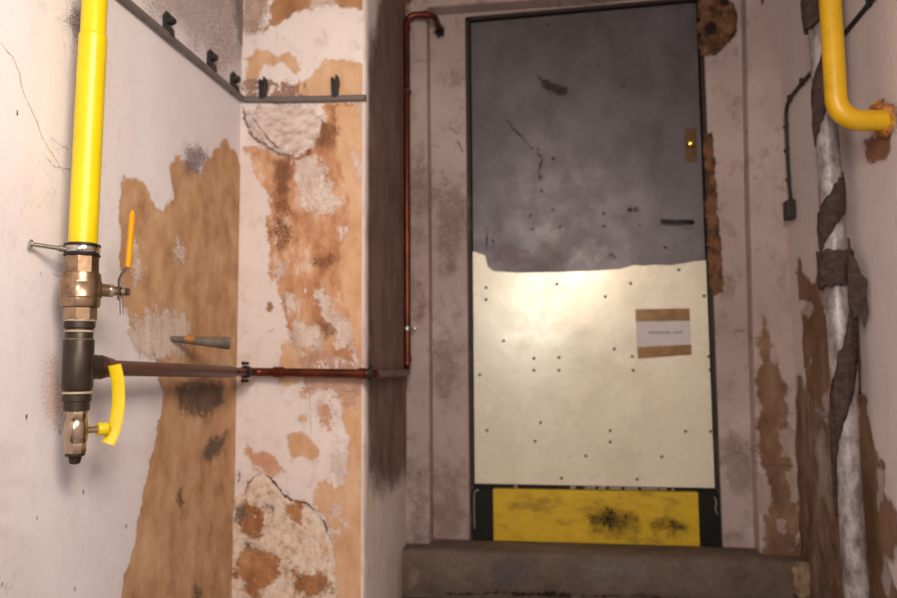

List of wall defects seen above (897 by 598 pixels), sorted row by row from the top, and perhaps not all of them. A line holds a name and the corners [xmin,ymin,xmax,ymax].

crack [1,43,70,174]
peeling [265,0,363,30]
spalling [693,0,737,57]
spalling [869,97,897,140]
spalling [703,132,725,297]
peeling [117,48,362,598]
peeling [795,257,831,422]
peeling [754,316,811,598]
peeling [857,393,897,598]